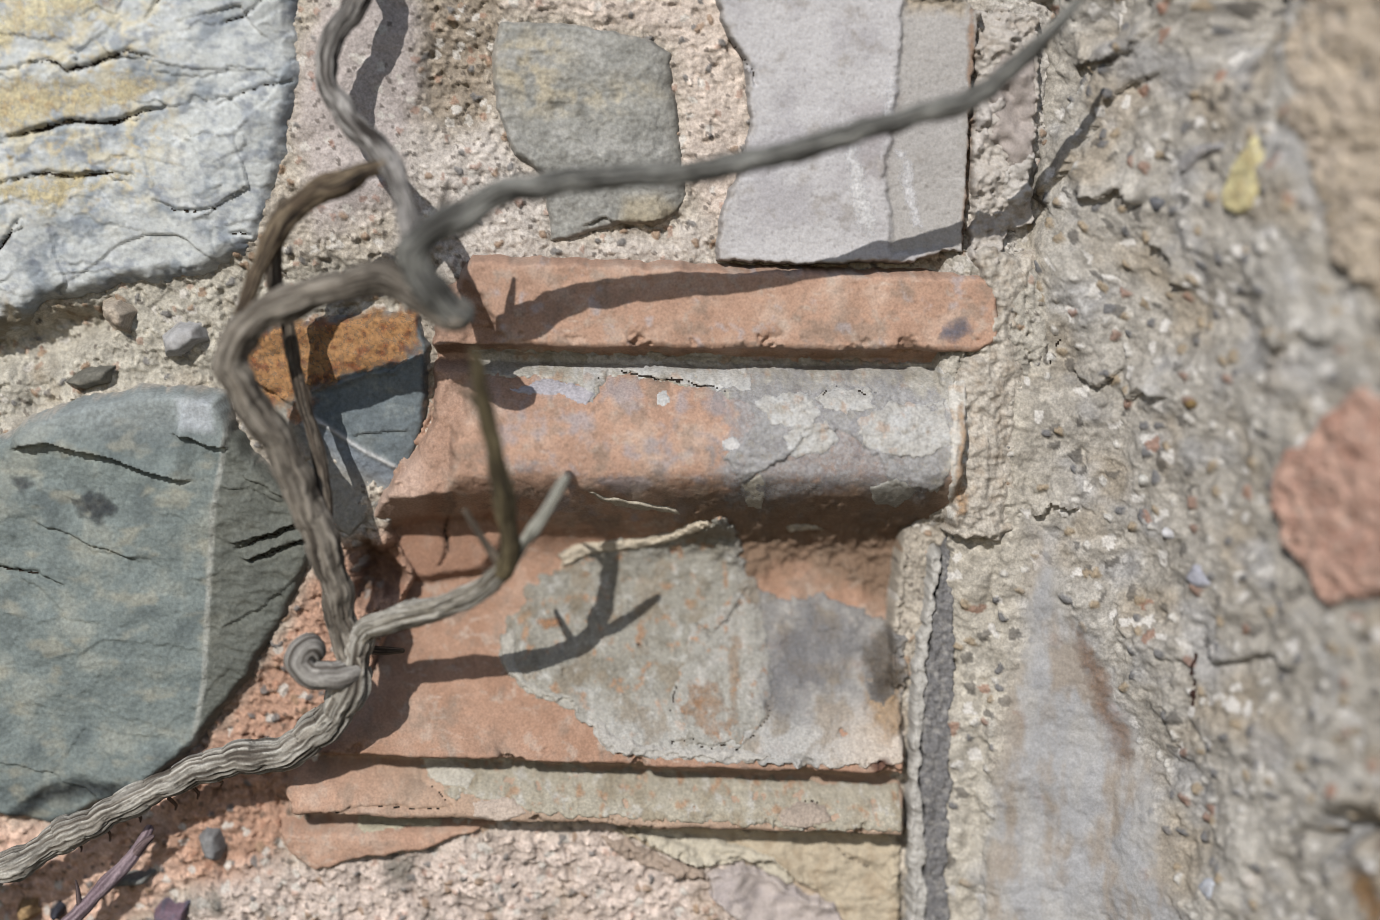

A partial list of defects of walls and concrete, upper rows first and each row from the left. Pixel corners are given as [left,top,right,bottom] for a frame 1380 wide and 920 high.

peeling [374,269,970,528]
peeling [421,491,910,920]